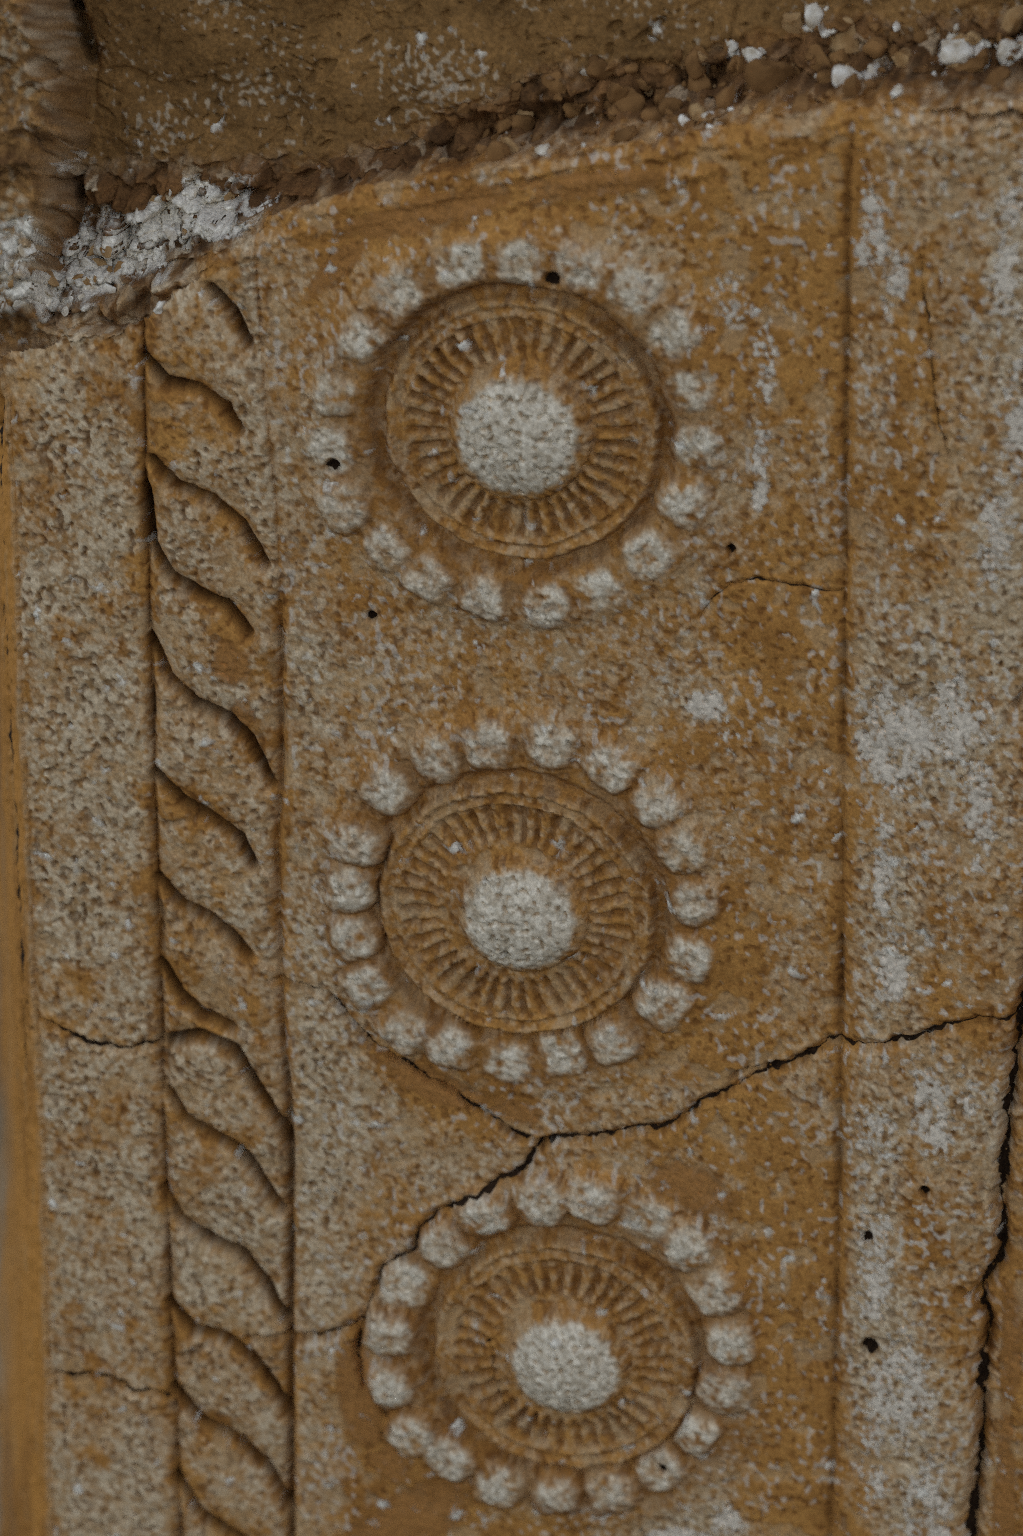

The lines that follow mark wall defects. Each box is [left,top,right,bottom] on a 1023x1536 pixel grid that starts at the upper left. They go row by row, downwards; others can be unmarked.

spalling [938,32,1023,87]
spalling [0,175,279,321]
crack [918,249,948,452]
crack [0,405,8,494]
crack [703,577,843,611]
crack [3,603,163,1071]
crack [258,977,1023,1536]
crack [59,1371,171,1398]
spalling [452,1418,464,1436]